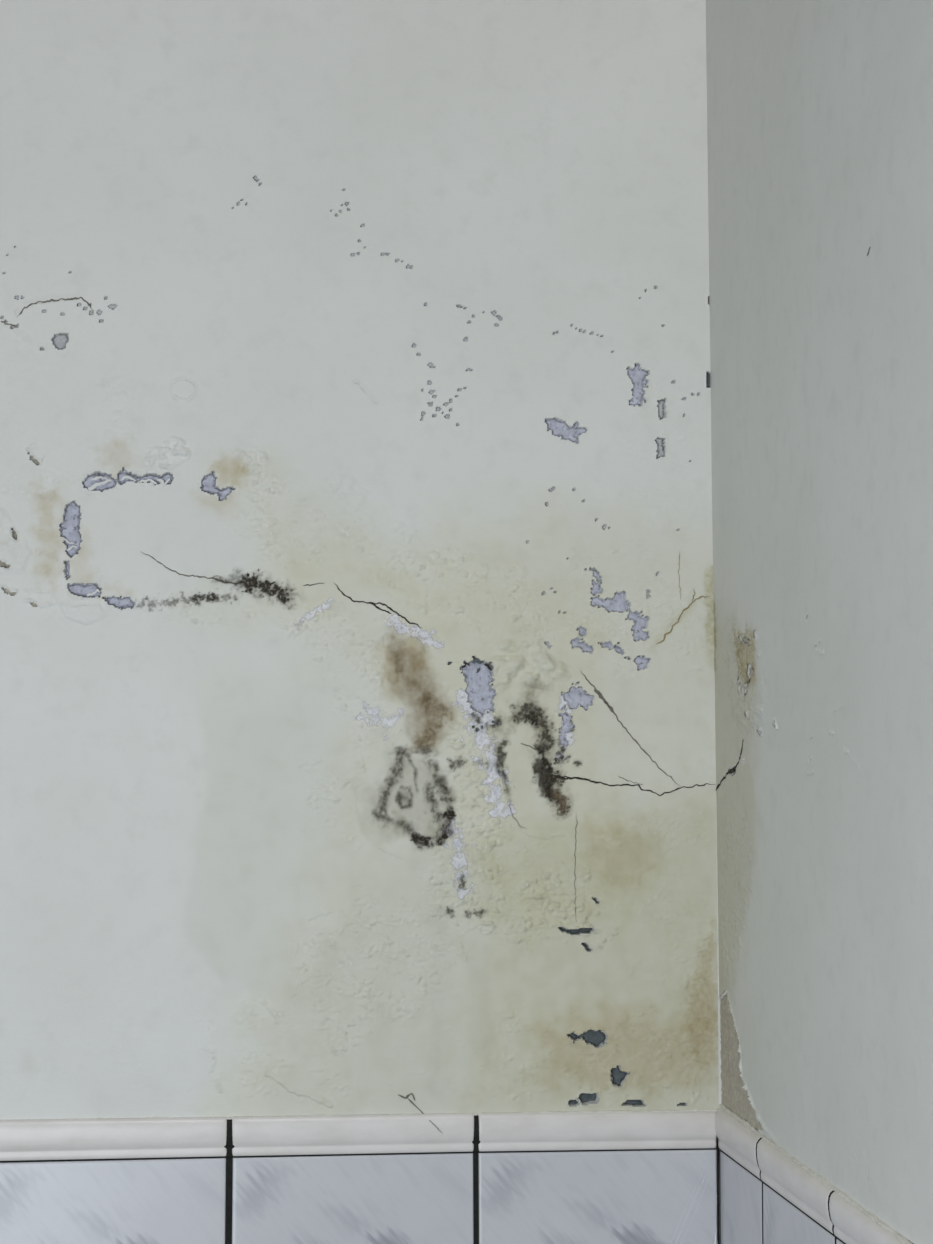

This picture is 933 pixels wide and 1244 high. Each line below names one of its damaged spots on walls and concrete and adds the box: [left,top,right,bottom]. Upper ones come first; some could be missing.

crack [143,553,243,586]
peeling [0,381,402,777]
crack [303,583,420,628]
water stain [386,614,444,649]
peeling [540,517,778,774]
crack [656,554,709,645]
crack [553,672,744,796]
water stain [383,689,581,914]
peeling [268,653,621,1112]
crack [572,820,580,919]
spalling [562,1025,654,1111]
peeling [671,919,765,1135]